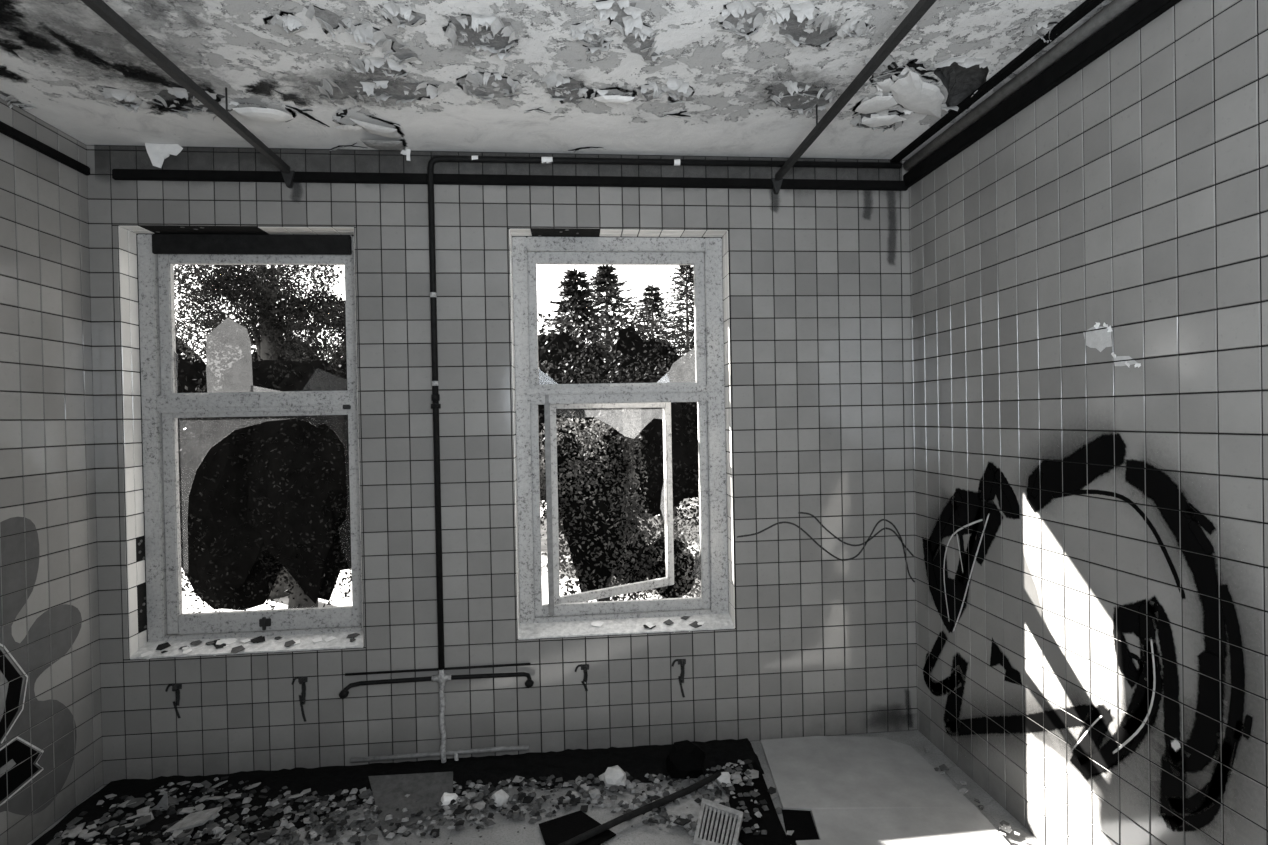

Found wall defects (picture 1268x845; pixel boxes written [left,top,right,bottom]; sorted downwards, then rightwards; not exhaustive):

peeling [568,0,666,61]
peeling [716,0,871,49]
peeling [1022,21,1062,43]
peeling [0,91,38,110]
peeling [100,85,239,121]
peeling [263,0,521,161]
peeling [541,71,595,108]
peeling [633,77,695,105]
peeling [765,79,839,116]
spalling [850,55,991,133]
peeling [145,143,183,168]
spalling [1083,322,1141,368]